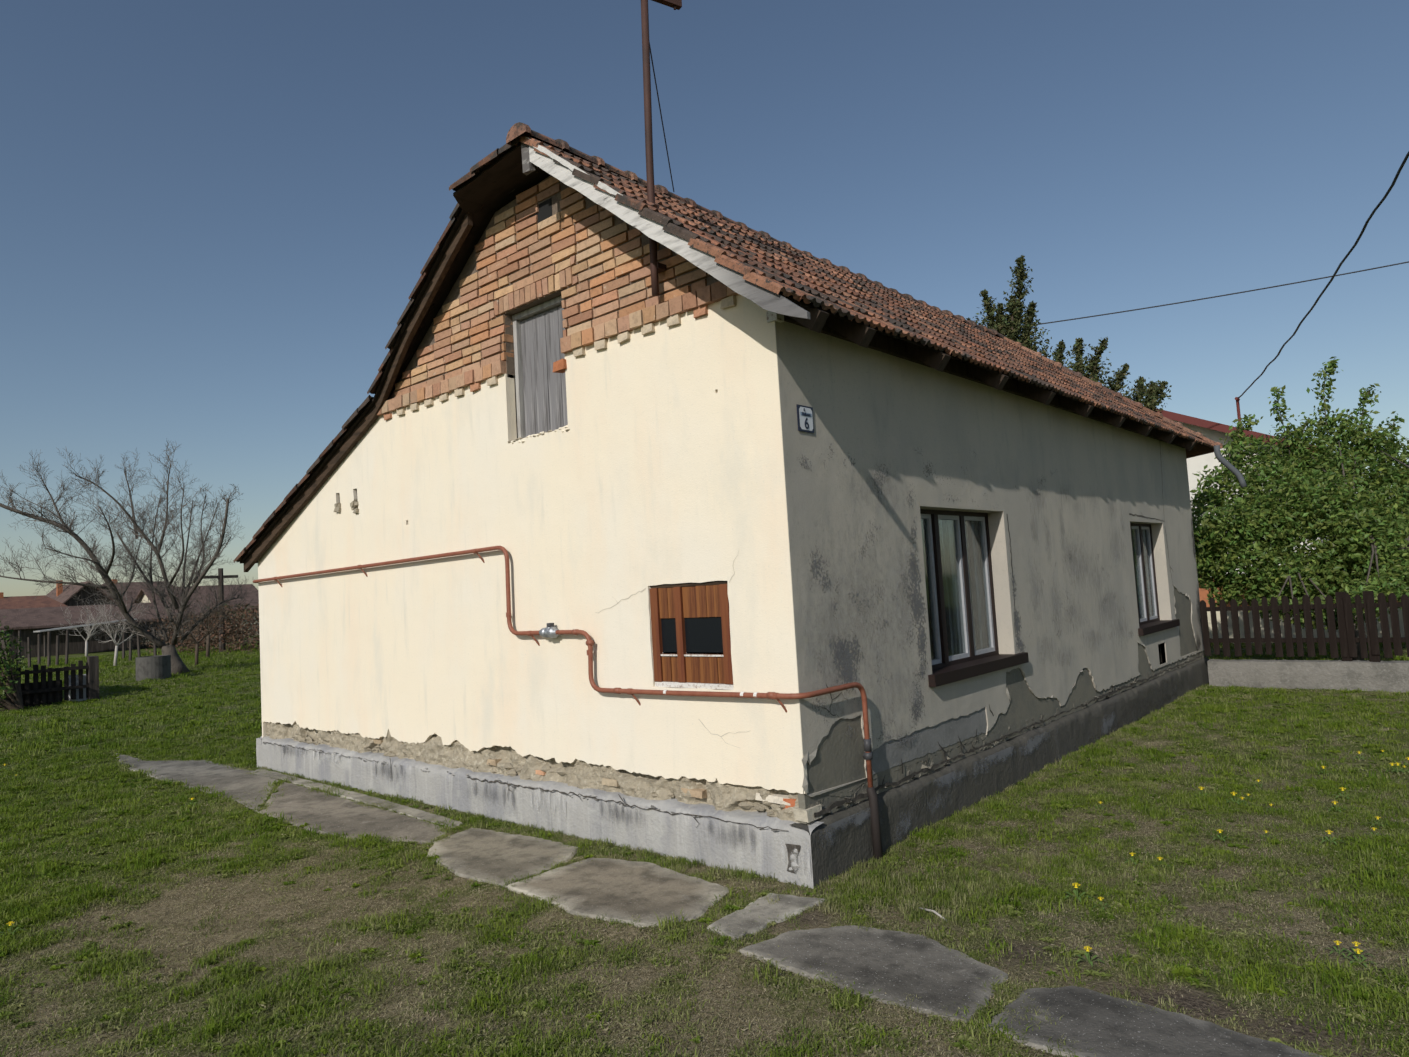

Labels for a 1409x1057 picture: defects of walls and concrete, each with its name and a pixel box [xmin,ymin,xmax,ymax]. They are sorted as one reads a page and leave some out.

spalling [263,585,1204,832]
damp [810,491,928,748]
damp [1010,572,1030,652]